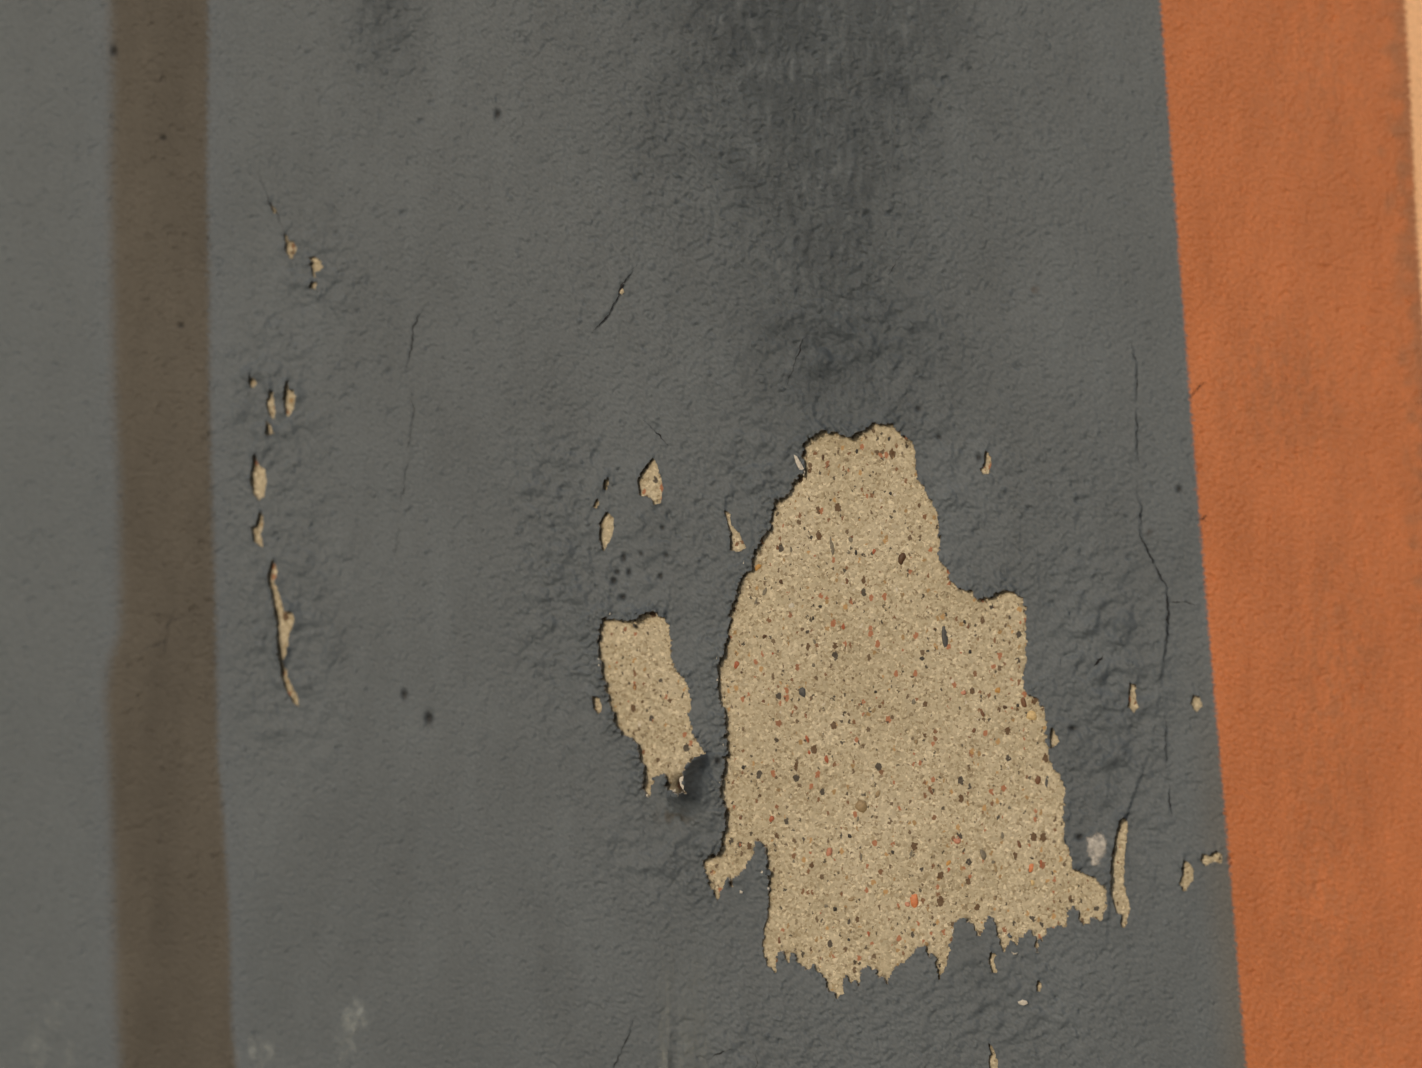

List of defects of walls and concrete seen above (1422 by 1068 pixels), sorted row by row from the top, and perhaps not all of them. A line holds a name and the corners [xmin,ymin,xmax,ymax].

peeling [248,375,295,436]
peeling [249,453,299,707]
peeling [591,422,1131,999]
crack [1131,344,1193,680]